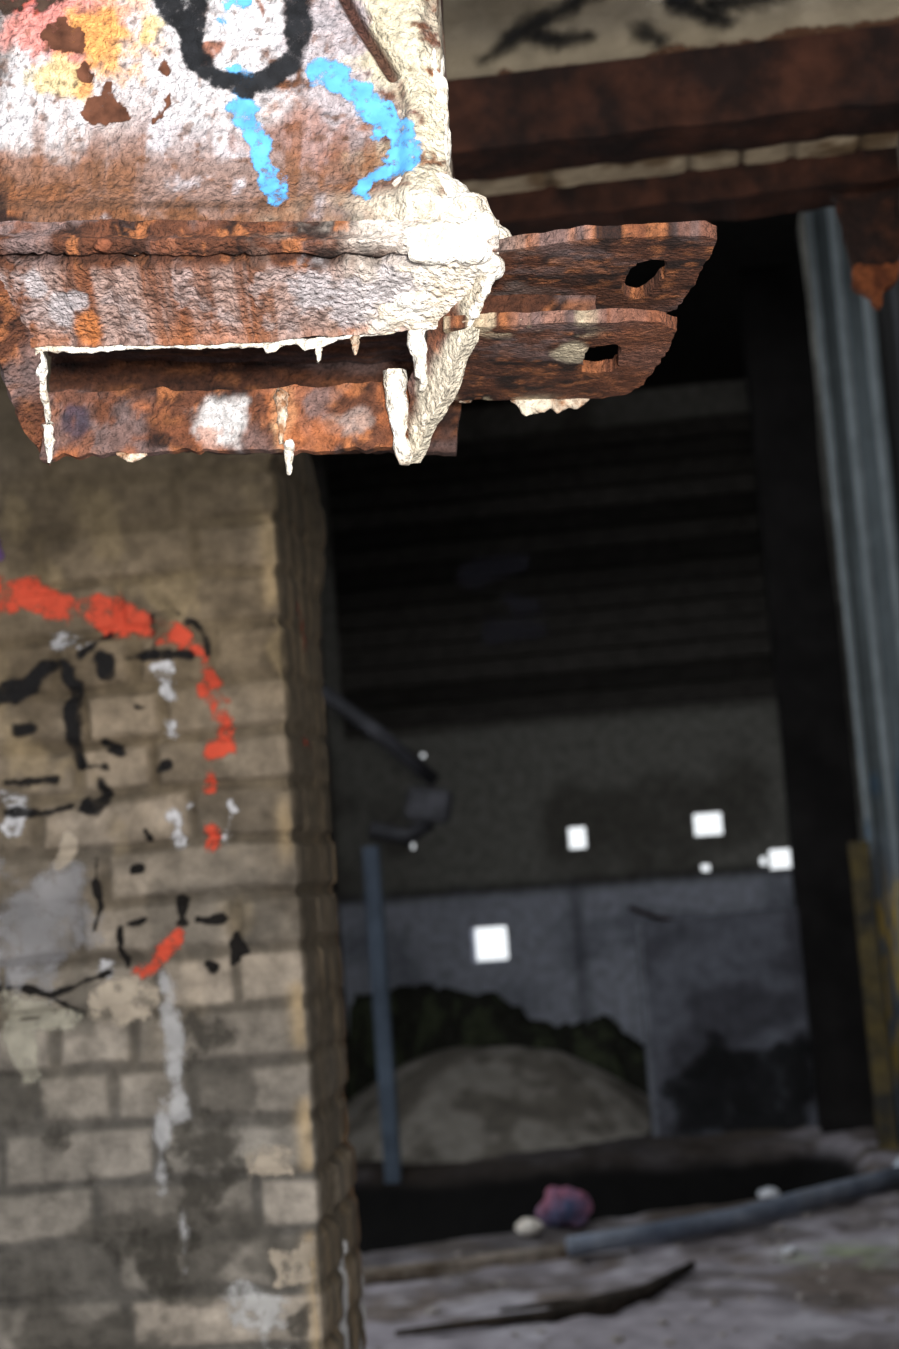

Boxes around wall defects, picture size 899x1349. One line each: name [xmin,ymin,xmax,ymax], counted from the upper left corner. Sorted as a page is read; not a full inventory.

rust [647,17,899,56]